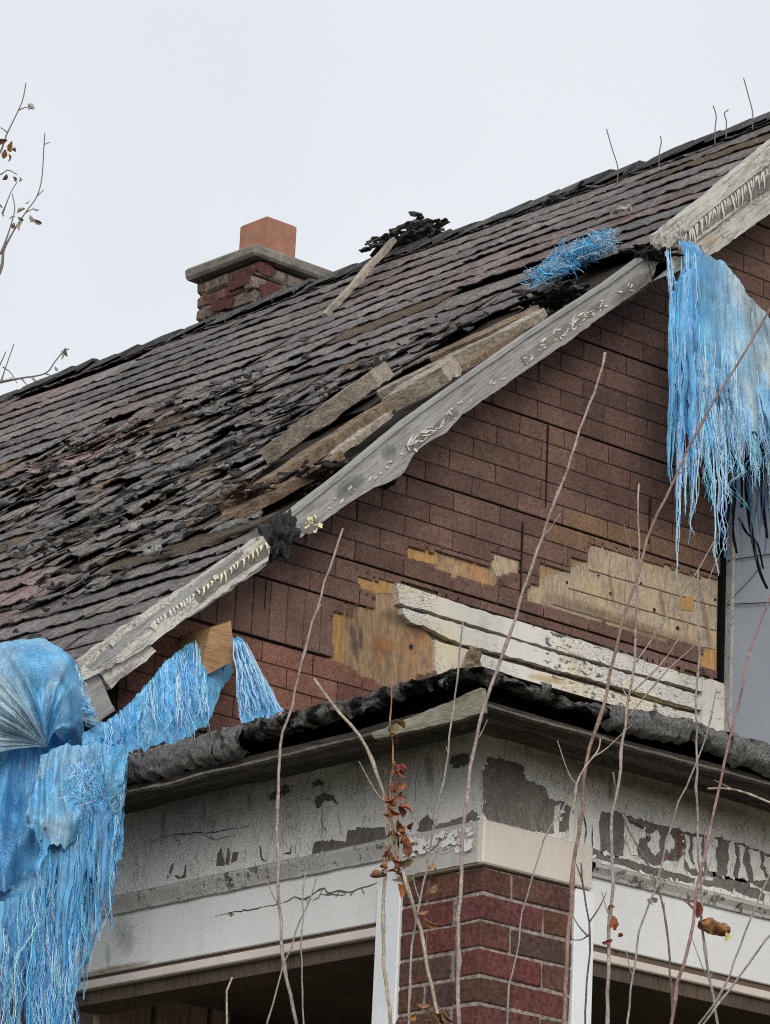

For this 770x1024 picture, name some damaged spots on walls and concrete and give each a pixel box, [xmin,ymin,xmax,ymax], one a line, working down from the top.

peeling [86,542,269,671]
peeling [270,785,291,801]
peeling [310,779,338,809]
peeling [403,756,573,857]
peeling [214,846,239,866]
peeling [312,826,386,854]
peeling [592,810,770,904]
crack [217,882,377,916]